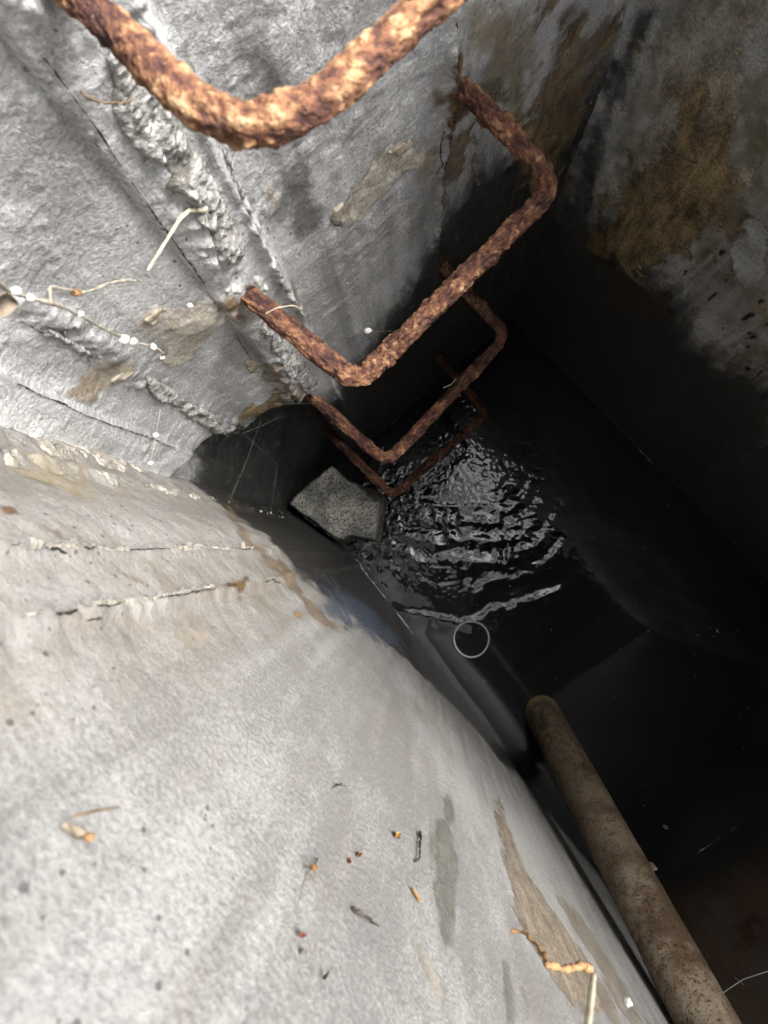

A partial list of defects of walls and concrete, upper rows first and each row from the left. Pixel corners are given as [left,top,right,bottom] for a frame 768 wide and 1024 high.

crack [42,57,205,286]
corrosion [436,53,474,185]
damp [471,0,768,282]
crack [46,546,96,554]
crack [55,601,121,621]
crack [160,587,218,598]
damp [494,798,620,1024]